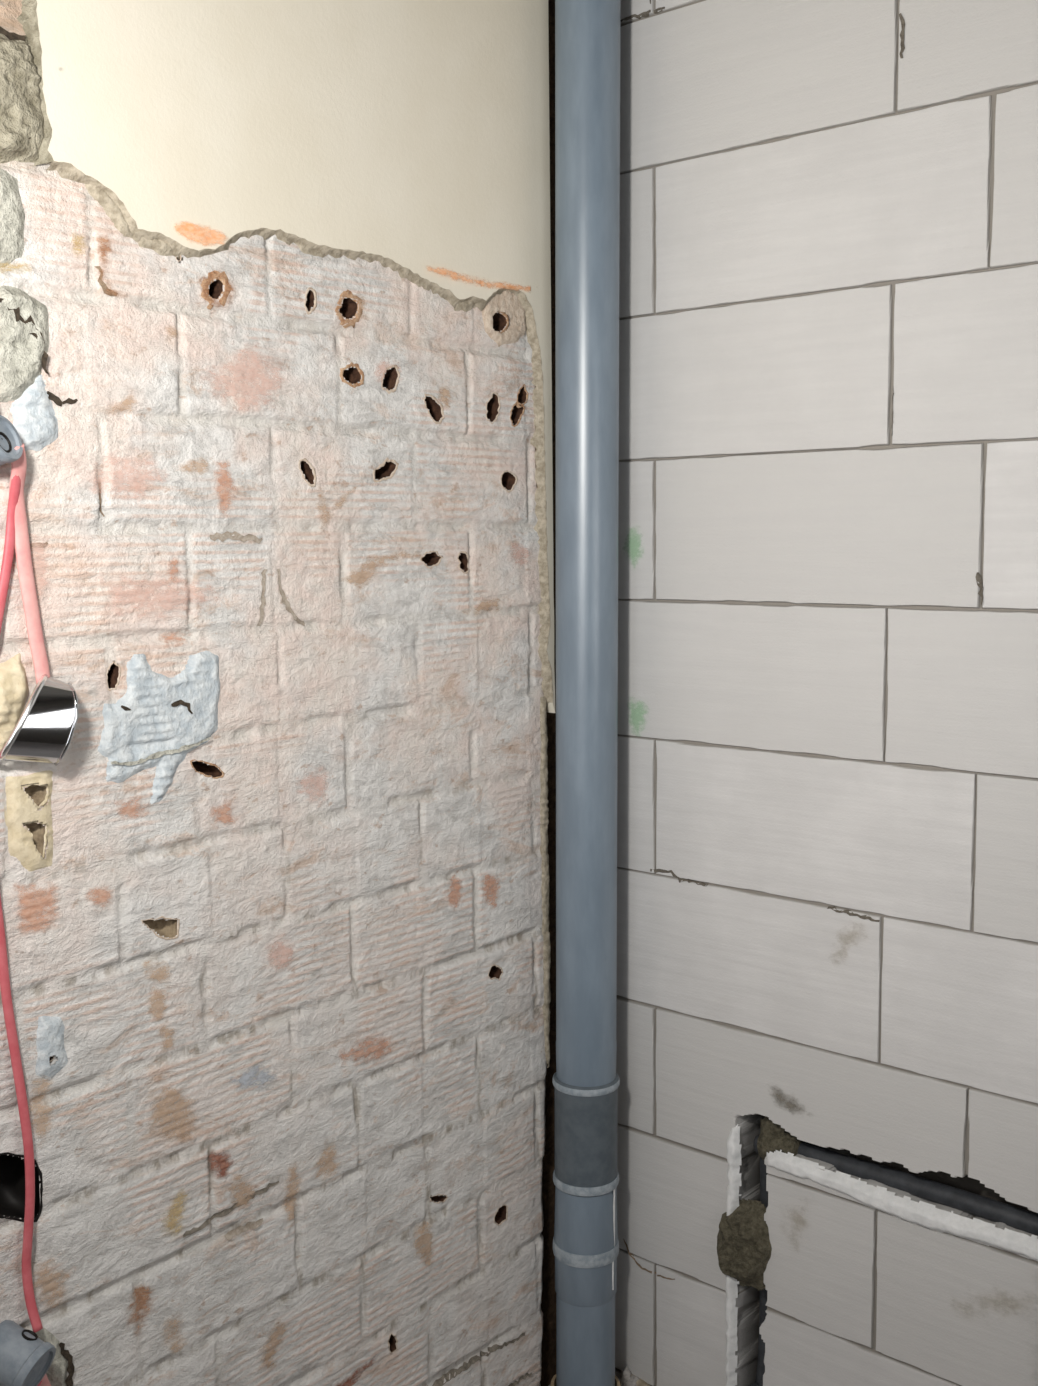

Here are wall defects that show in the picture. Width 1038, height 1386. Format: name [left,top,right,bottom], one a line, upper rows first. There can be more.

spalling [17,0,553,703]
spalling [190,760,225,779]
spalling [21,783,49,859]
spalling [141,916,180,940]
spalling [488,964,503,981]
peeling [208,1152,254,1206]
crack [183,1181,279,1241]
spalling [429,1194,448,1204]
spalling [494,1204,508,1226]
spalling [388,1333,398,1354]
crack [432,1333,525,1386]
crack [508,1373,532,1386]